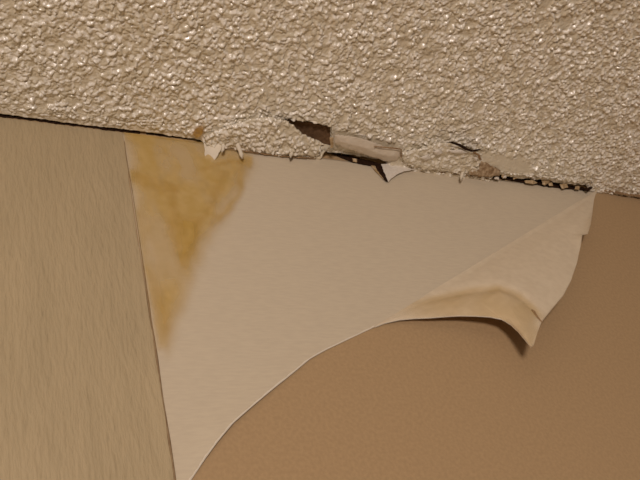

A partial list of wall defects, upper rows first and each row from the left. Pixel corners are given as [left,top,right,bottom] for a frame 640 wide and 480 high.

water stain [128,133,238,265]
peeling [371,191,597,347]